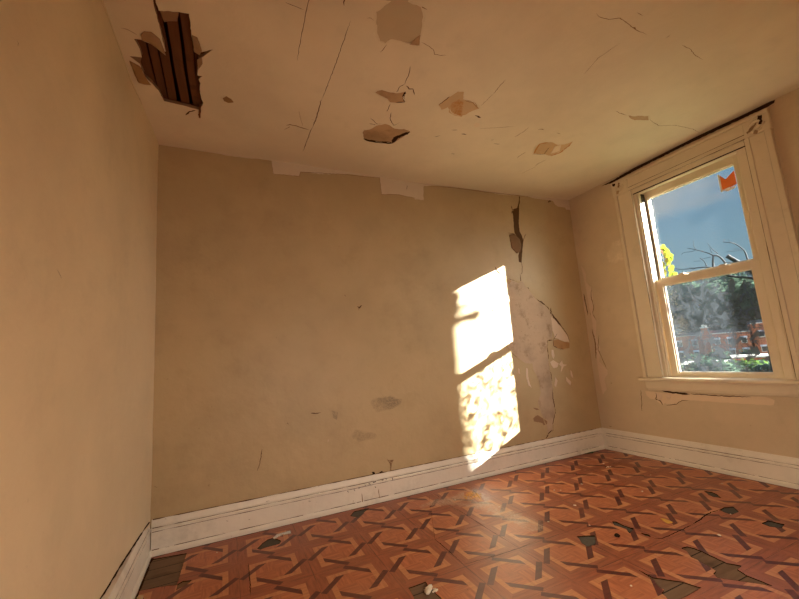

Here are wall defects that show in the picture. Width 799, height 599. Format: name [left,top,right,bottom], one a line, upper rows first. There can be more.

spalling [130,0,211,110]
crack [284,23,350,151]
peeling [361,123,412,144]
peeling [373,88,407,104]
peeling [374,0,426,45]
crack [495,197,526,282]
flaking render [496,275,573,435]
crack [537,299,560,438]